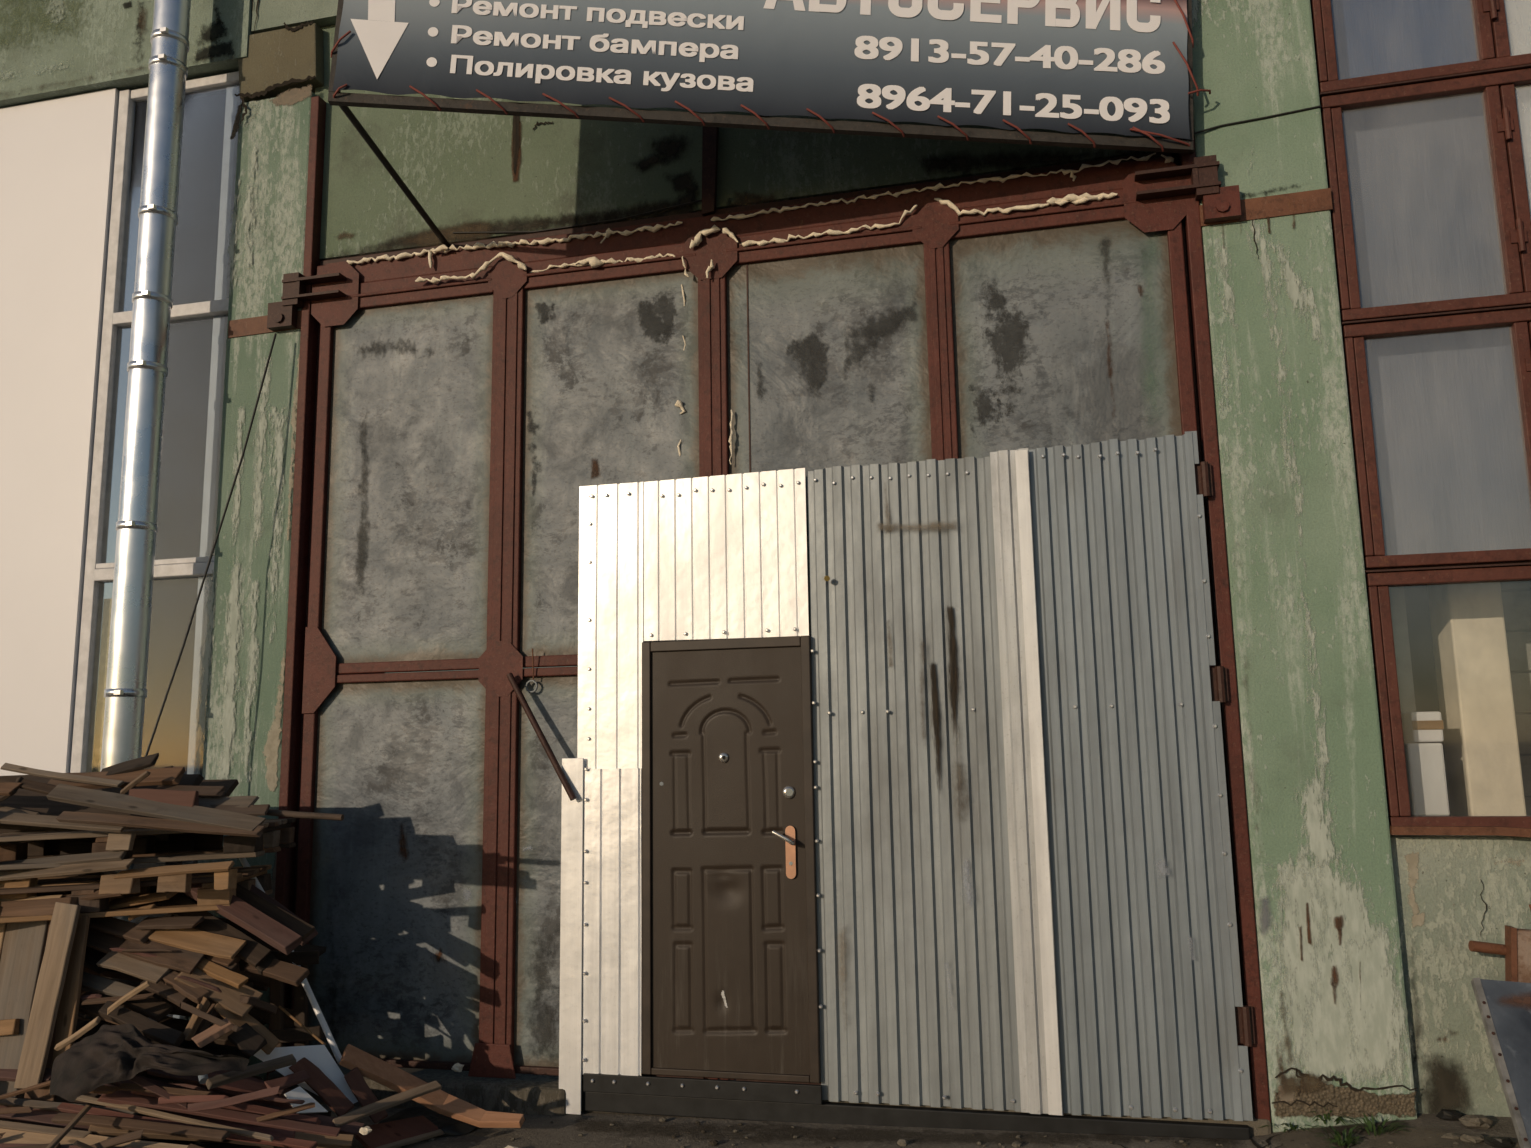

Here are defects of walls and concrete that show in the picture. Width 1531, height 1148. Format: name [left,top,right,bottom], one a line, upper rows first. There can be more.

peeling [230,85,312,139]
peeling [228,145,257,296]
peeling [1217,246,1237,327]
peeling [1246,220,1321,544]
peeling [195,354,300,792]
rust [1299,903,1312,960]
rust [1334,916,1343,945]
peeling [1271,593,1475,1148]